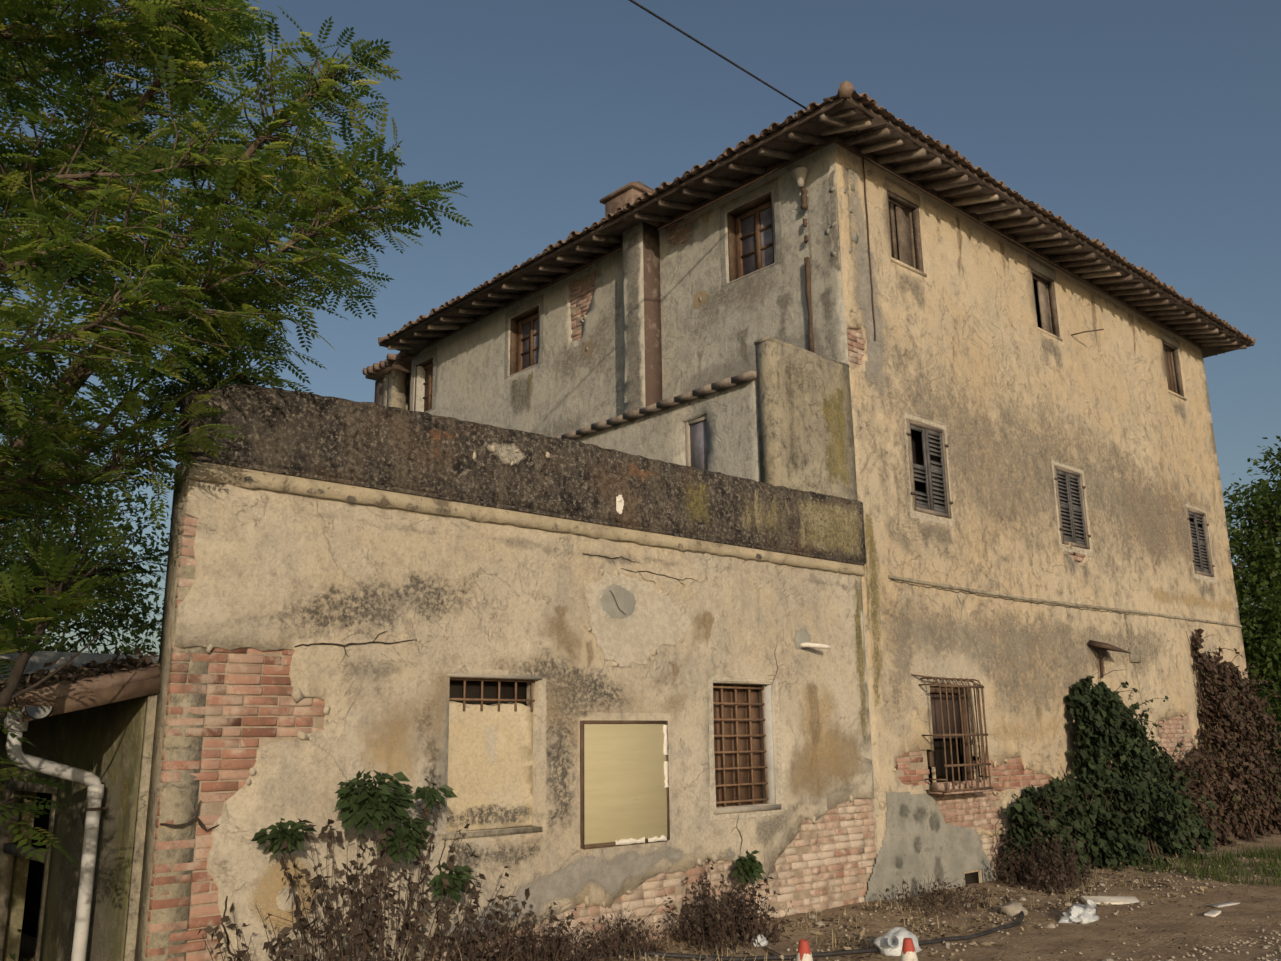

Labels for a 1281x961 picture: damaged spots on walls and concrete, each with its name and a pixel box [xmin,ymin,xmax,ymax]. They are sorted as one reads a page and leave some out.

spalling [569,270,597,341]
spalling [847,328,866,369]
crack [583,553,697,614]
crack [294,631,415,657]
spalling [145,642,331,961]
spalling [418,795,877,961]